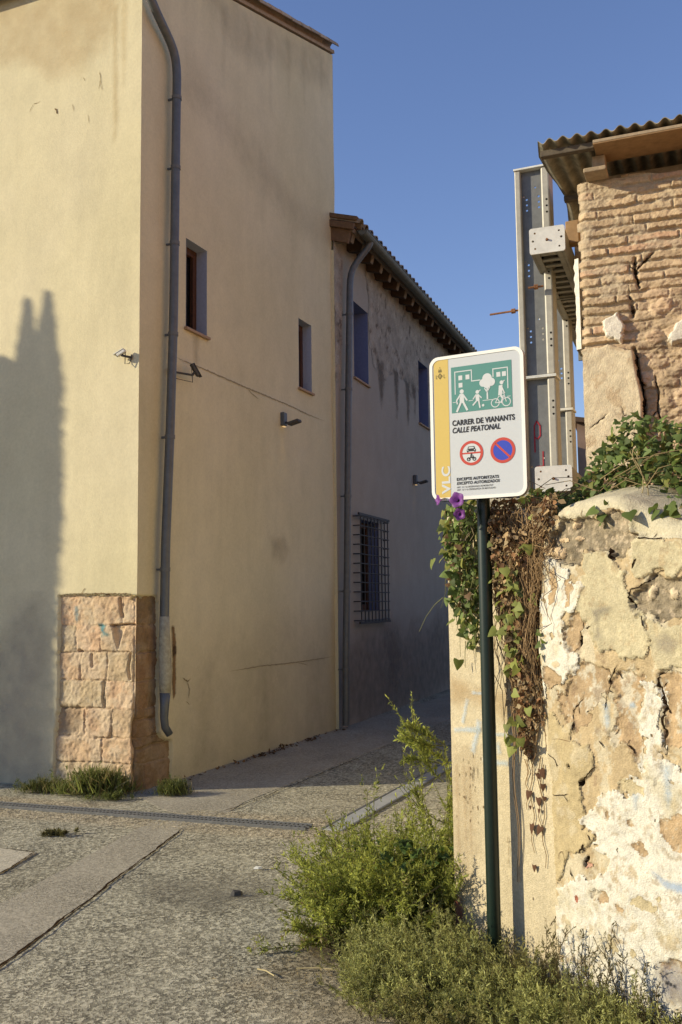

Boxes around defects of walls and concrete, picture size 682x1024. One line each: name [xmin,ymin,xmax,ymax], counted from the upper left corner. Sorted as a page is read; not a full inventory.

crack [629,254,652,317]
crack [592,354,661,427]
crack [657,670,672,751]
peeling [538,509,682,1024]